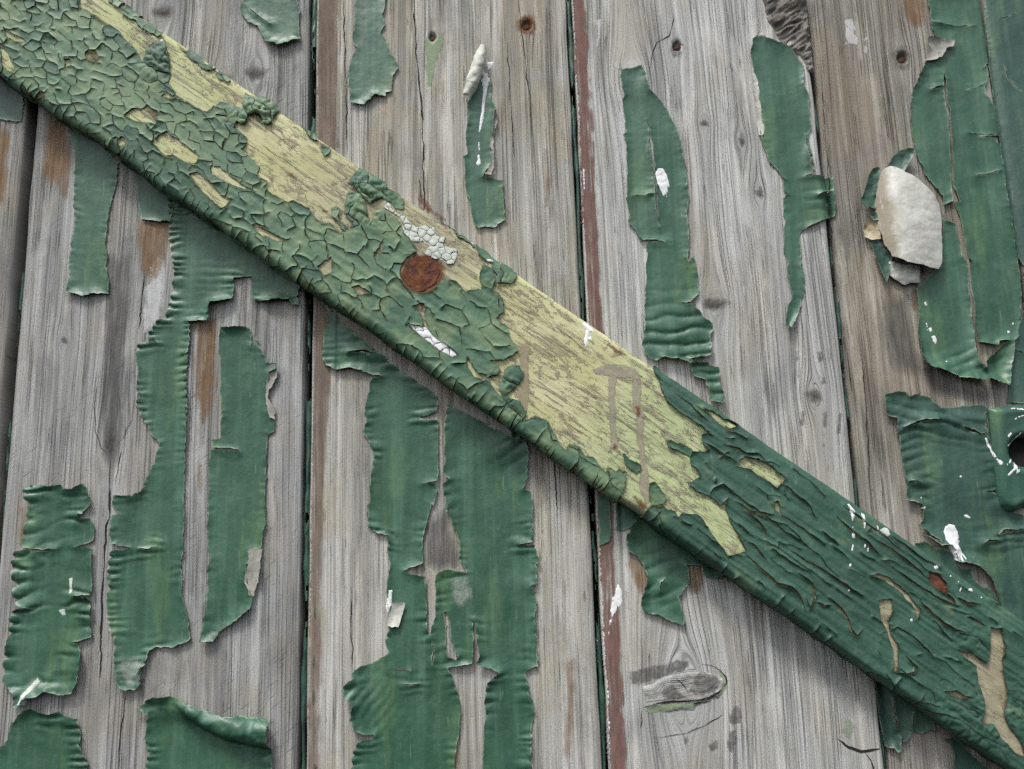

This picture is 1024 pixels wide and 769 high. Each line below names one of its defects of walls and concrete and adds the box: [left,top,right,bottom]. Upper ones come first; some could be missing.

crack [0,0,641,506]
rust [402,255,443,309]
peeling [462,43,506,228]
peeling [615,62,725,403]
peeling [750,35,836,327]
crack [820,71,833,258]
peeling [860,0,1024,403]
peeling [0,482,95,769]
peeling [106,173,540,769]
crack [347,601,355,670]
crack [638,366,1024,769]
peeling [884,391,1024,621]